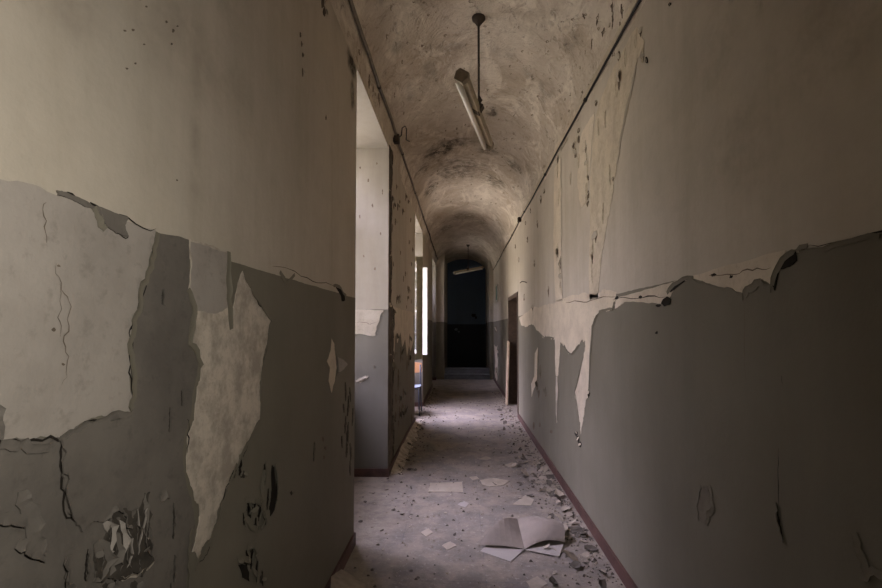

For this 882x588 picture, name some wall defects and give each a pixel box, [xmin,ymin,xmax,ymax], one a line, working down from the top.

peeling [0,179,279,588]
peeling [327,339,376,475]
flaking render [355,145,414,467]
peeling [519,27,808,447]
crack [799,230,882,255]